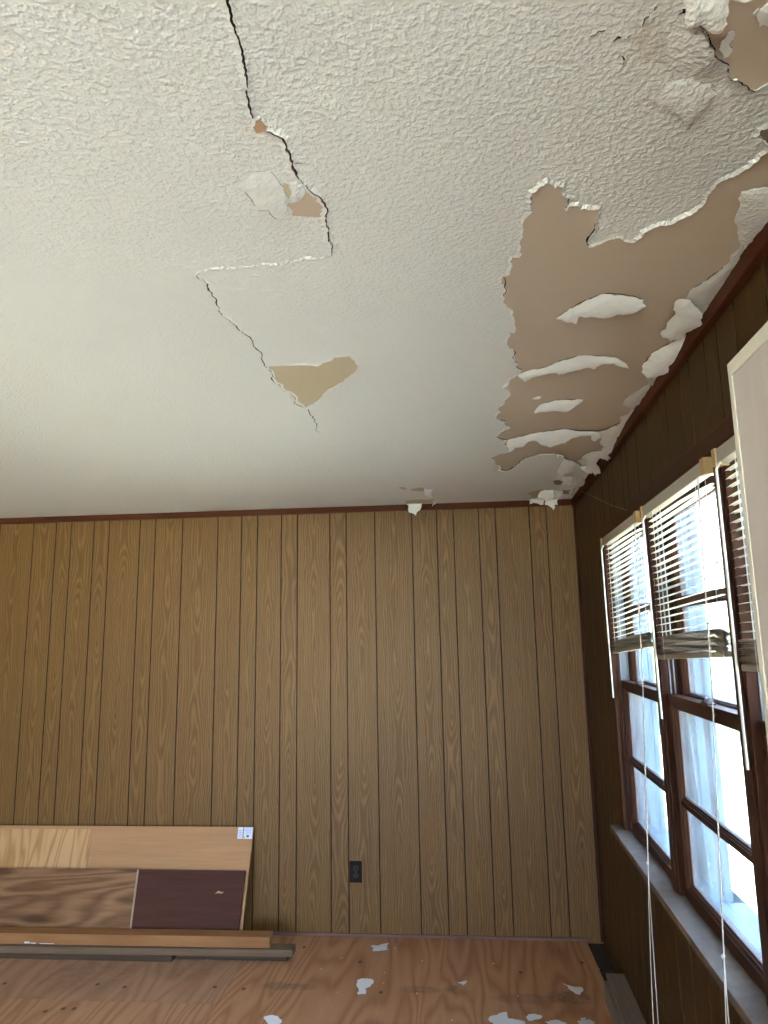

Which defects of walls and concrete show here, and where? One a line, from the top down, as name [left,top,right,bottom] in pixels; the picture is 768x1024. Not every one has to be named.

peeling [678,0,768,93]
spalling [250,115,269,135]
crack [191,0,338,427]
peeling [237,171,323,220]
peeling [490,123,768,510]
peeling [266,354,362,409]
peeling [399,487,436,516]